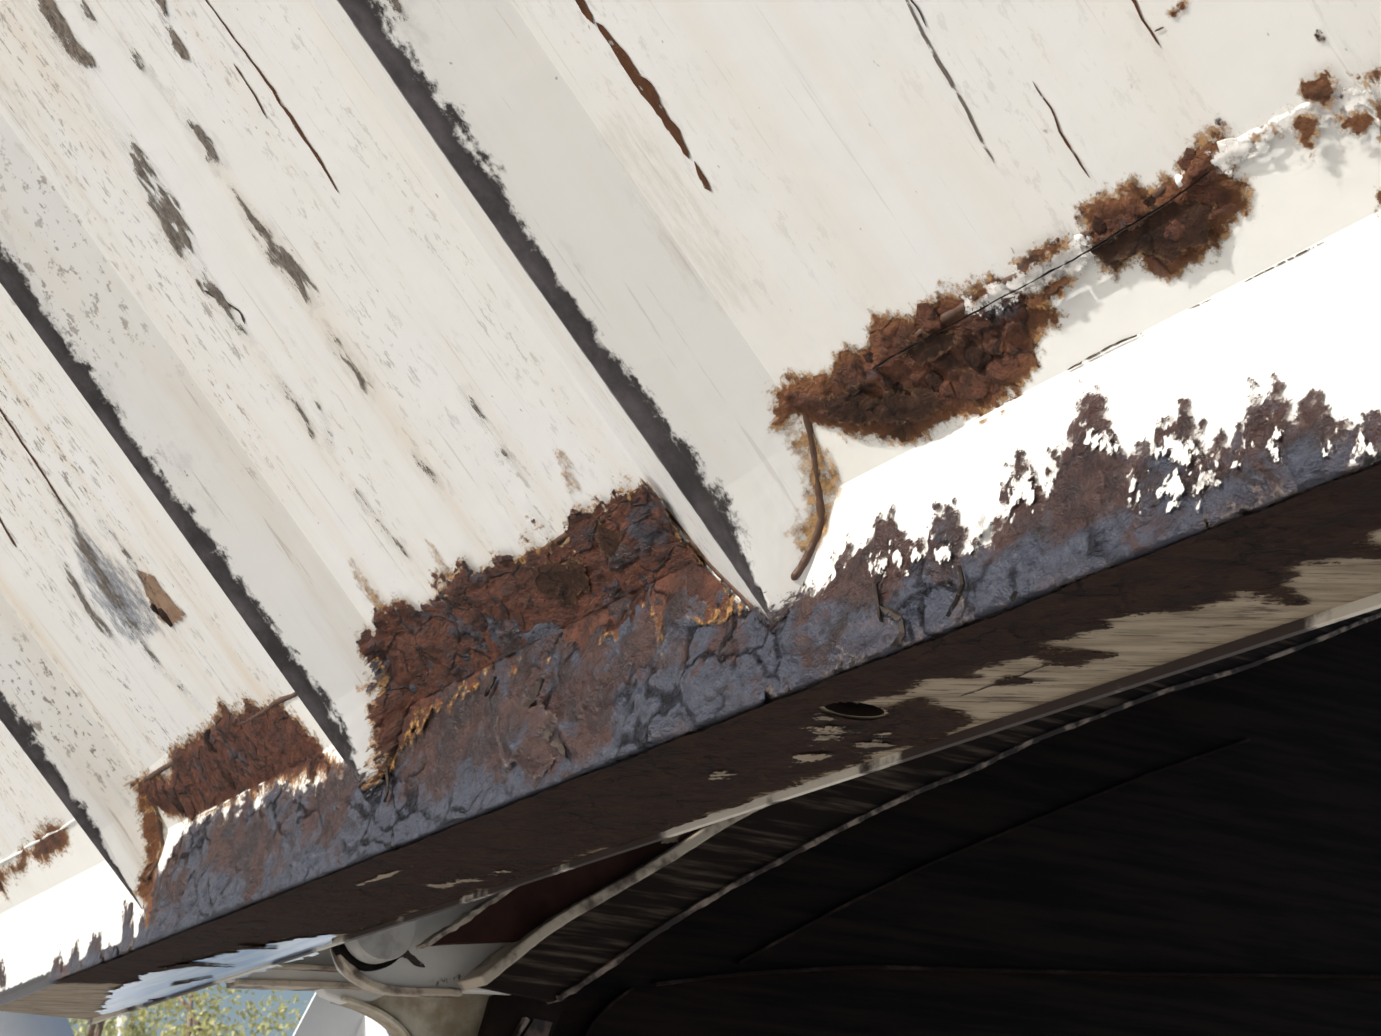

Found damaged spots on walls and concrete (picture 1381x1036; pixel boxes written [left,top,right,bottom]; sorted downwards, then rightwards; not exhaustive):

crack [575,0,711,191]
corrosion [1346,68,1381,143]
corrosion [1074,118,1255,283]
corrosion [46,271,1381,985]
corrosion [0,818,69,899]